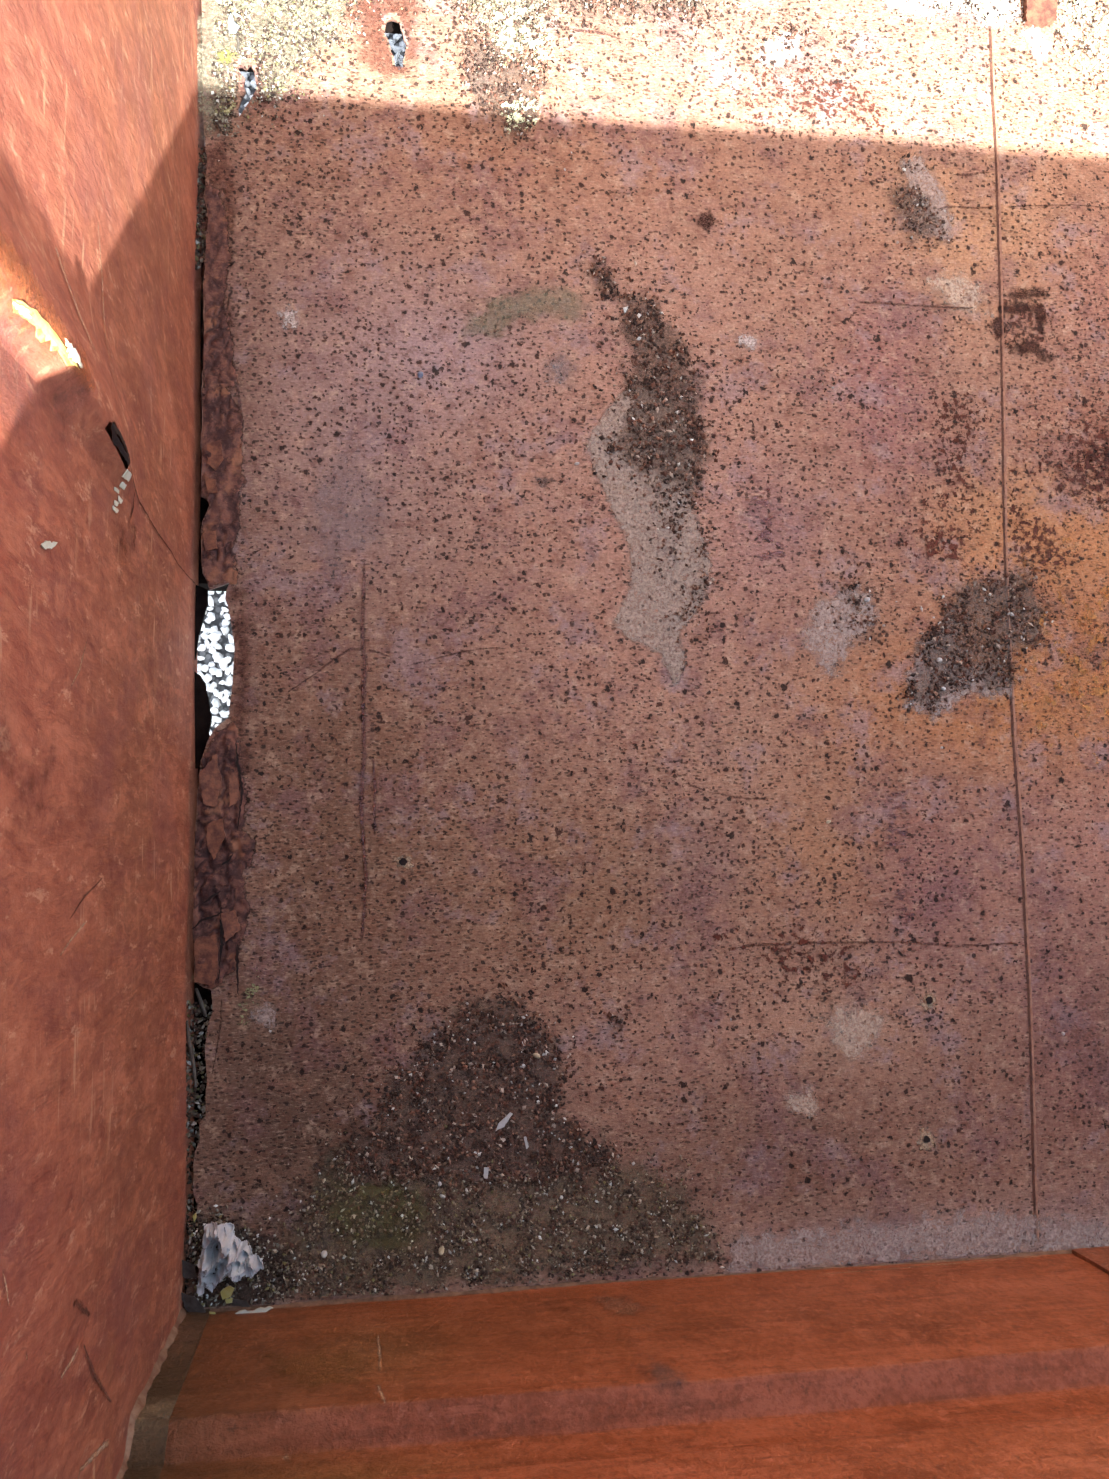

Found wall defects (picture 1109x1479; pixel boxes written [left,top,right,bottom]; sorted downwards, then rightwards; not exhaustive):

peeling [204,440,224,493]
peeling [203,530,218,551]
peeling [199,754,240,860]
peeling [194,910,241,985]